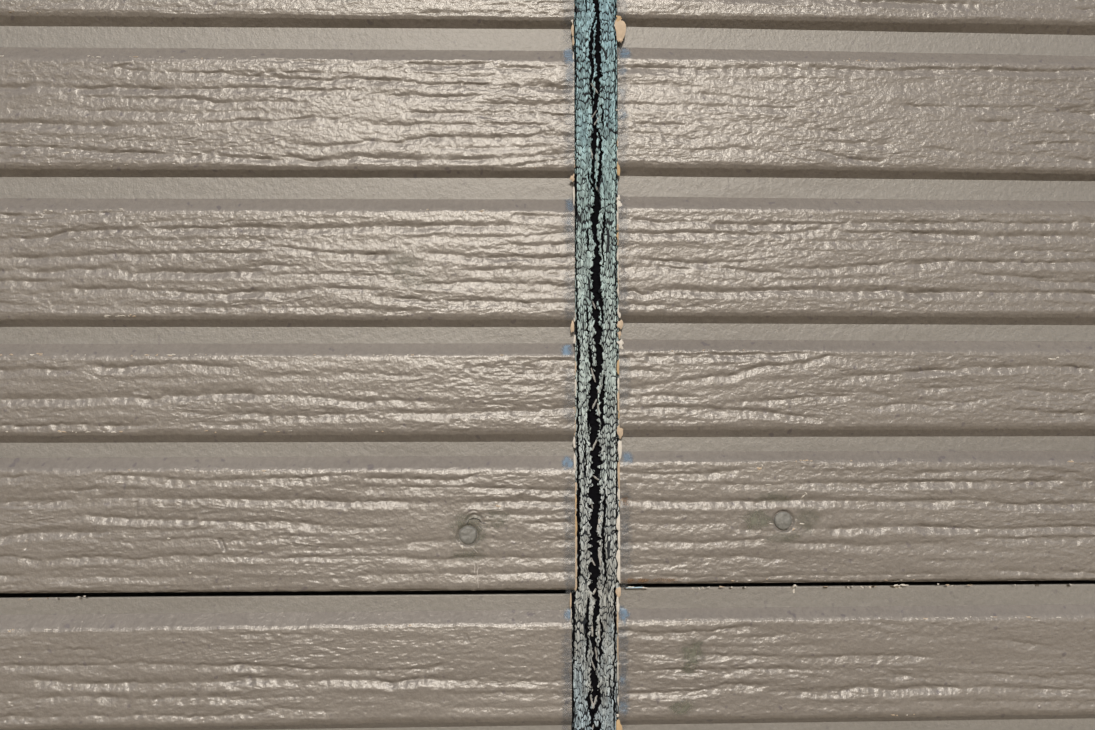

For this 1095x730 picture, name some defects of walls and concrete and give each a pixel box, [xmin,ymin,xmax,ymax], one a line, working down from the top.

crack [571,0,618,730]